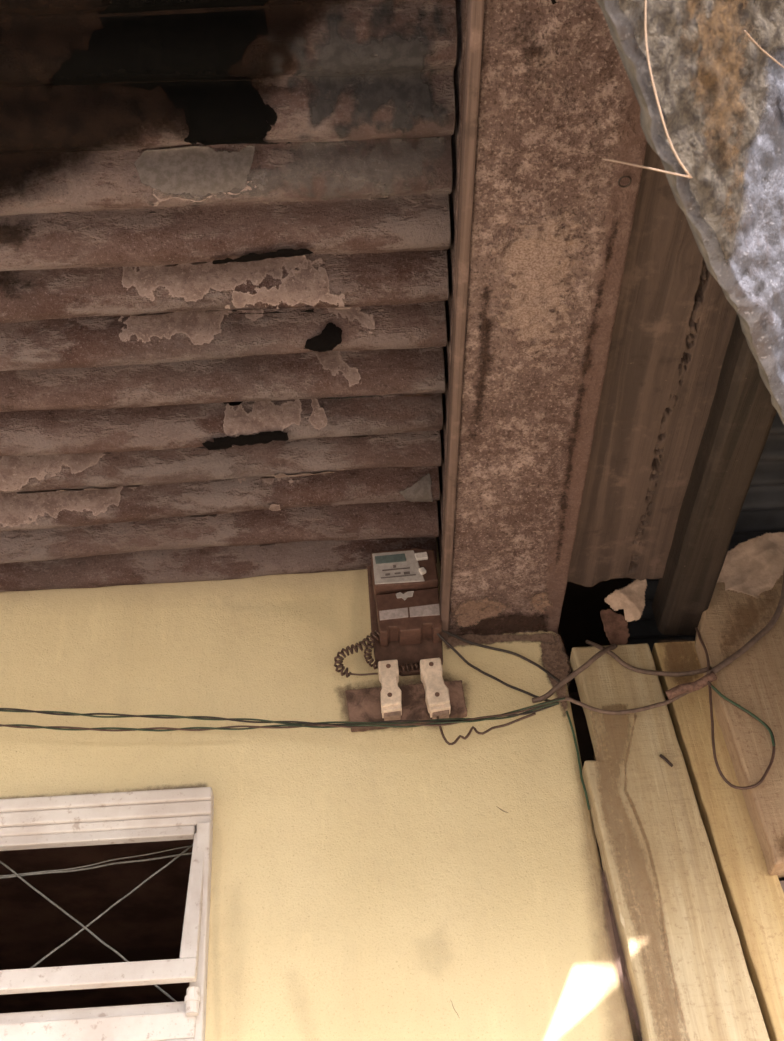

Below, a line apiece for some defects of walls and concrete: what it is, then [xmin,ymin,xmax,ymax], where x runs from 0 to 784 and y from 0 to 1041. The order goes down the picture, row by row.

peeling [118,255,375,345]
peeling [223,351,377,447]
peeling [0,452,139,528]